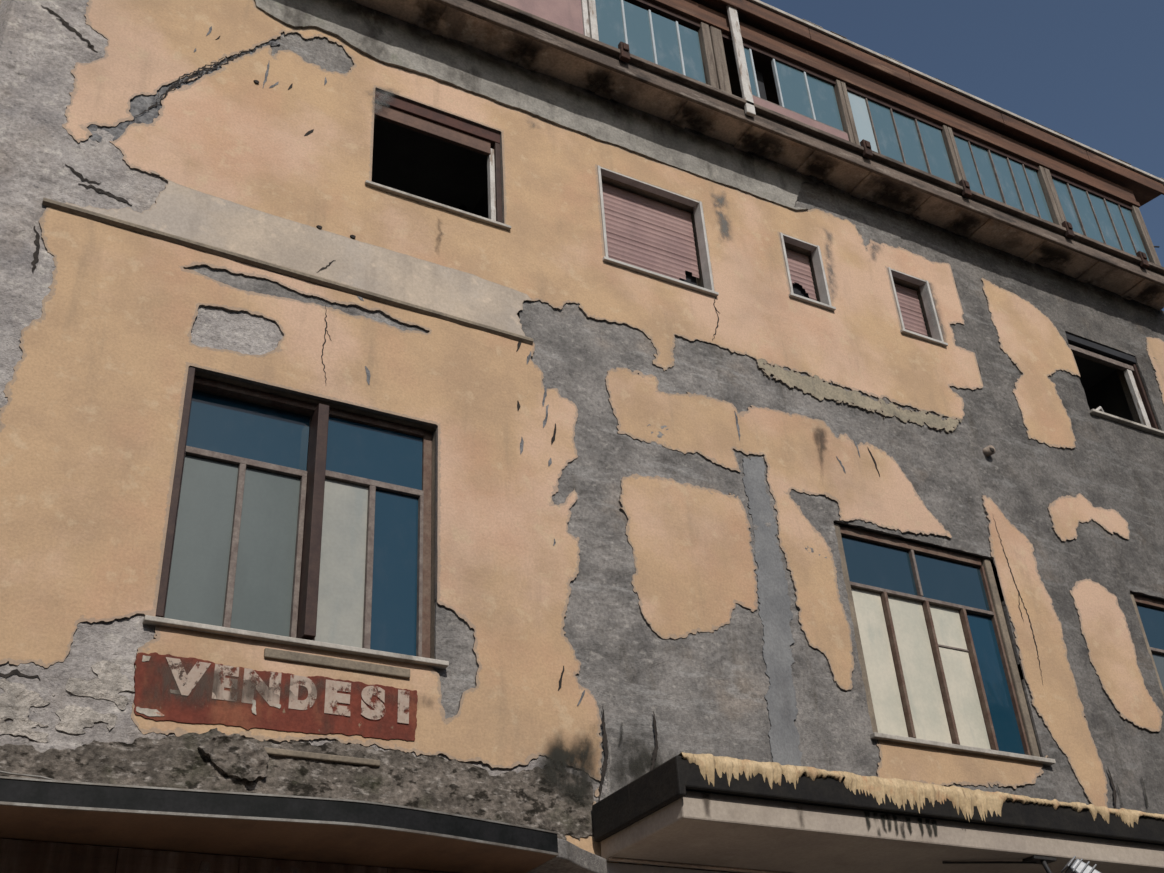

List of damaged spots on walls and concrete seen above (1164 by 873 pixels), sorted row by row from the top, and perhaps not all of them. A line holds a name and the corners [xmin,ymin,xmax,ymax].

flaking render [0,0,168,408]
damp [715,197,729,236]
flaking render [191,306,283,355]
flaking render [187,266,429,333]
crack [321,301,331,383]
flaking render [254,0,1164,814]
flaking render [0,614,176,753]
damp [541,706,661,803]
damp [678,752,1164,838]